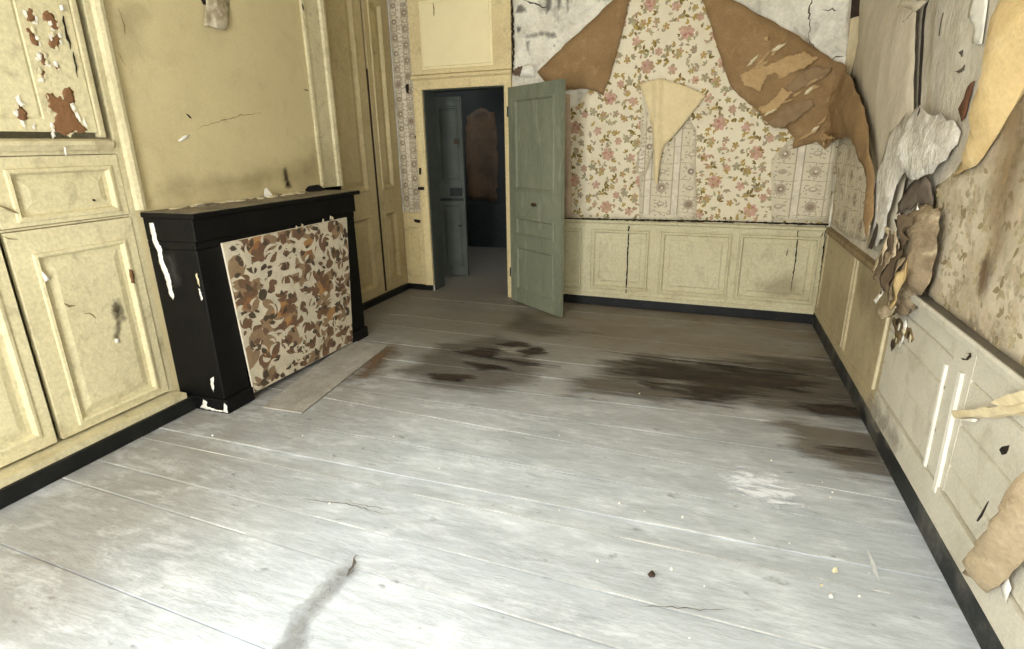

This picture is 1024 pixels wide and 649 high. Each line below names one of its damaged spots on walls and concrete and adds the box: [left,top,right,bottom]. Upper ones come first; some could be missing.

flaking render [954,0,988,73]
peeling [13,94,35,130]
peeling [23,4,88,156]
flaking render [866,81,974,249]
peeling [149,223,174,299]
crack [564,218,829,293]
damp [407,318,557,390]
peeling [890,317,914,351]
damp [573,355,896,477]
peeling [1000,578,1012,604]